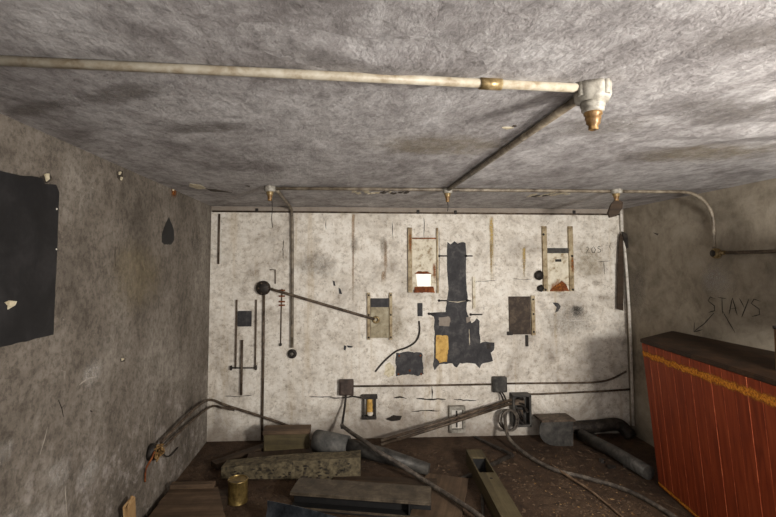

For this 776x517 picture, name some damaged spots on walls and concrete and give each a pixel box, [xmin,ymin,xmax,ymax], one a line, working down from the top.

peeling [395,351,424,376]
peeling [428,241,494,370]